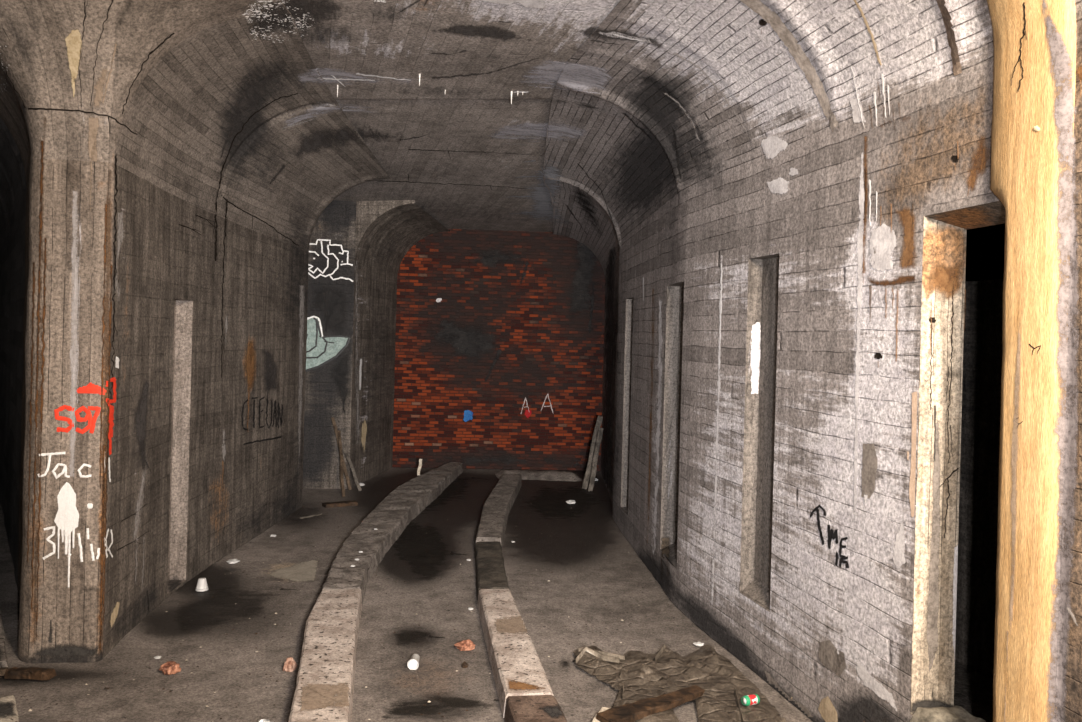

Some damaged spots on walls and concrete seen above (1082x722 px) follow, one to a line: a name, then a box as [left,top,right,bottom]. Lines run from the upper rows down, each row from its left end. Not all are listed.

damp [250,0,339,34]
crack [1011,2,1027,92]
rust [27,141,47,640]
crack [0,0,175,433]
crack [179,93,299,378]
rust [863,136,915,361]
rust [931,265,966,343]